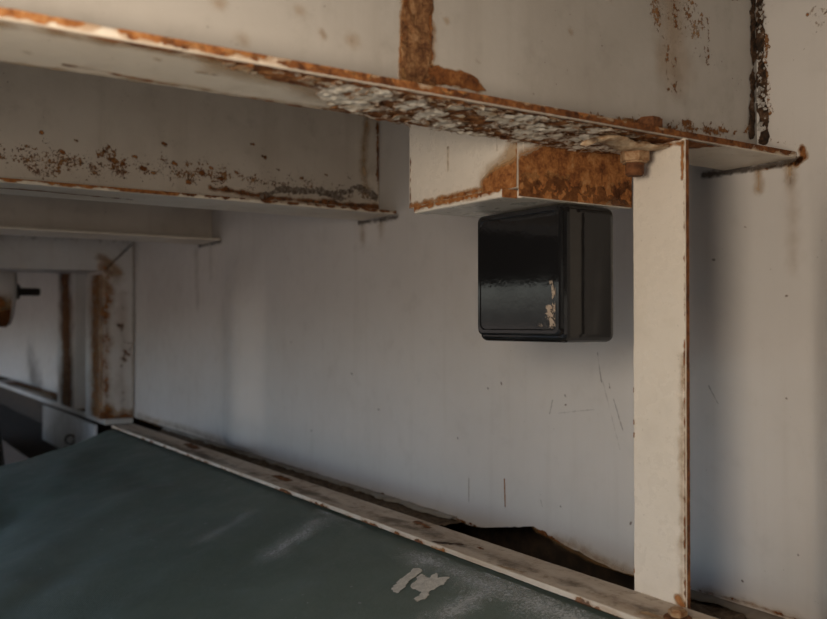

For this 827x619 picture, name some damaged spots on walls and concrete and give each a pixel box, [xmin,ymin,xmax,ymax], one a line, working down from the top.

rust [0,7,86,38]
rust [89,28,274,61]
peeling [354,85,635,153]
rust [0,130,398,224]
rust [0,296,12,327]
rust [5,273,72,408]
rust [82,244,134,419]
rust [190,0,808,609]